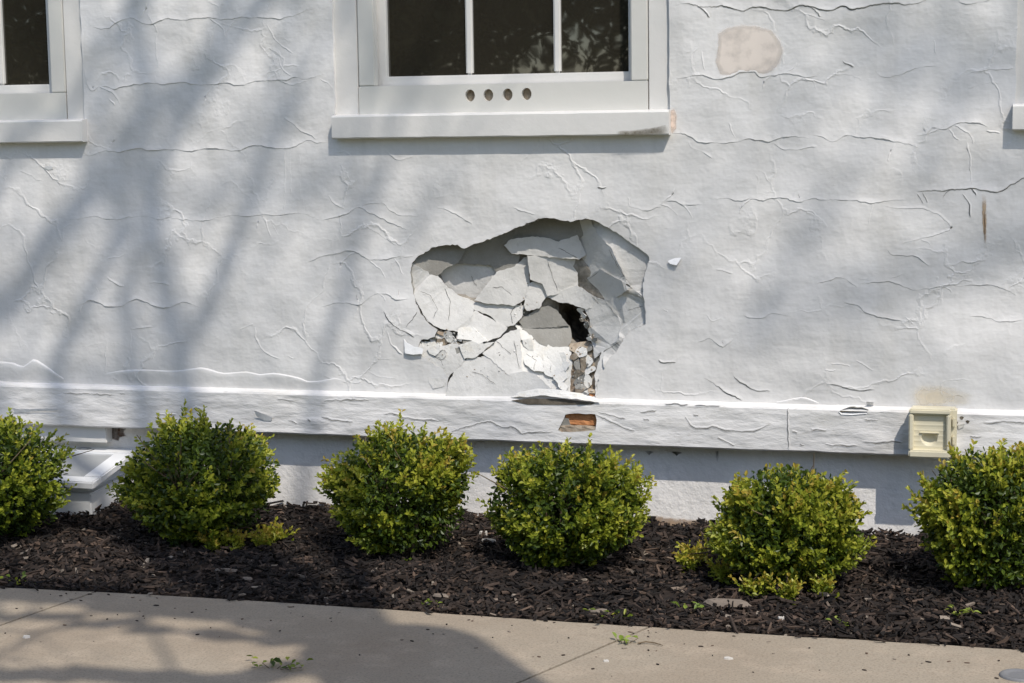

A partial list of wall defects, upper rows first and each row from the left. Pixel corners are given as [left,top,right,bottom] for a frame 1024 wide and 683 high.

crack [674,0,926,20]
crack [83,0,334,106]
crack [674,51,817,89]
crack [84,116,351,163]
crack [597,113,1024,324]
crack [306,195,473,355]
spalling [404,218,649,432]
crack [63,390,125,398]
crack [277,397,552,434]
crack [597,375,903,449]
crack [824,360,875,391]
crack [970,420,1024,438]